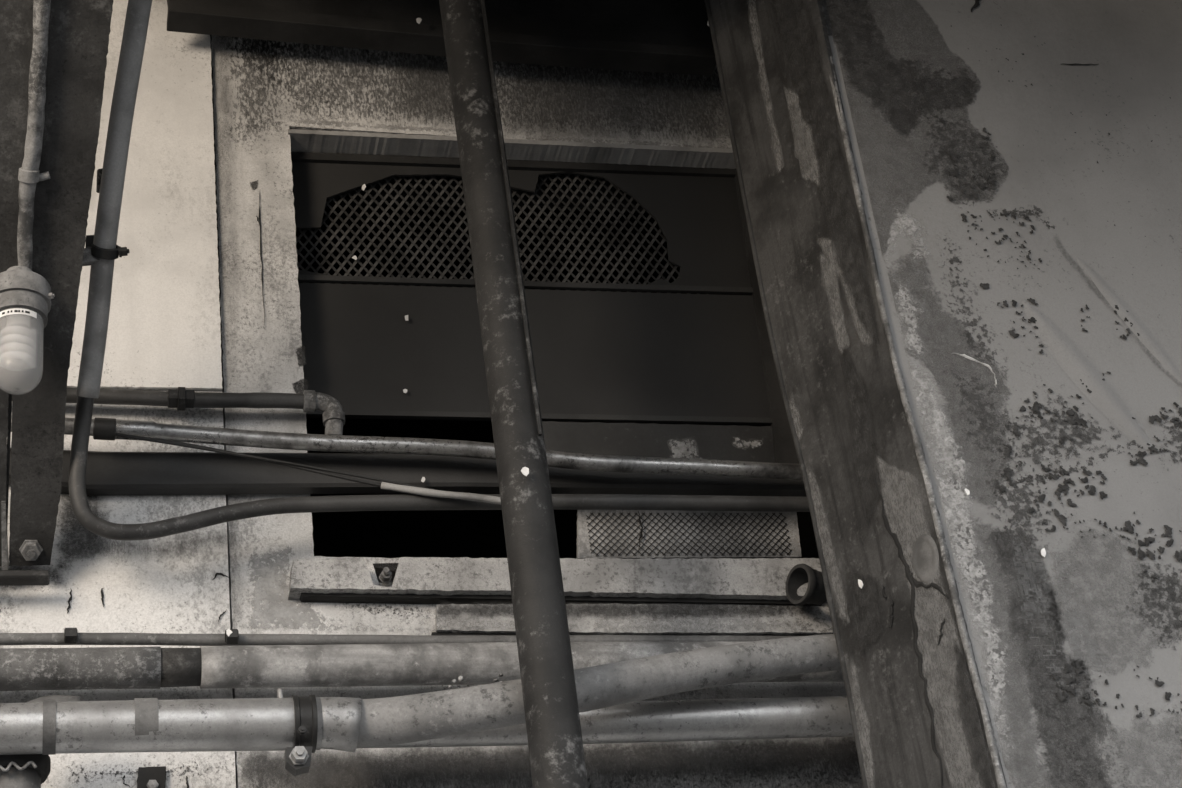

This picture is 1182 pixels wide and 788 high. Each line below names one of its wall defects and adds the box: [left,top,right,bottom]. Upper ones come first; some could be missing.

damp [223,36,286,133]
peeling [748,0,819,184]
peeling [819,238,879,352]
peeling [876,285,1009,788]
peeling [1041,529,1182,674]
peeling [1094,715,1182,788]